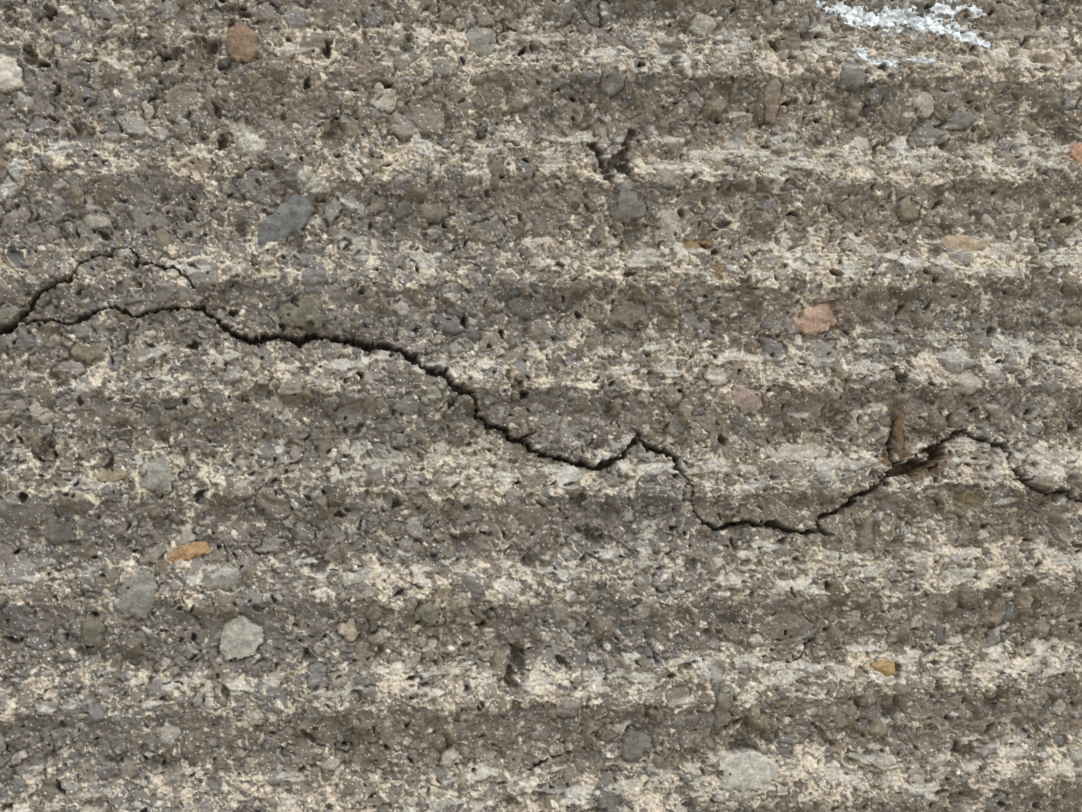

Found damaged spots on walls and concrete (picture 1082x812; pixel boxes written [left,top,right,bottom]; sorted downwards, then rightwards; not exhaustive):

crack [0,245,1082,538]